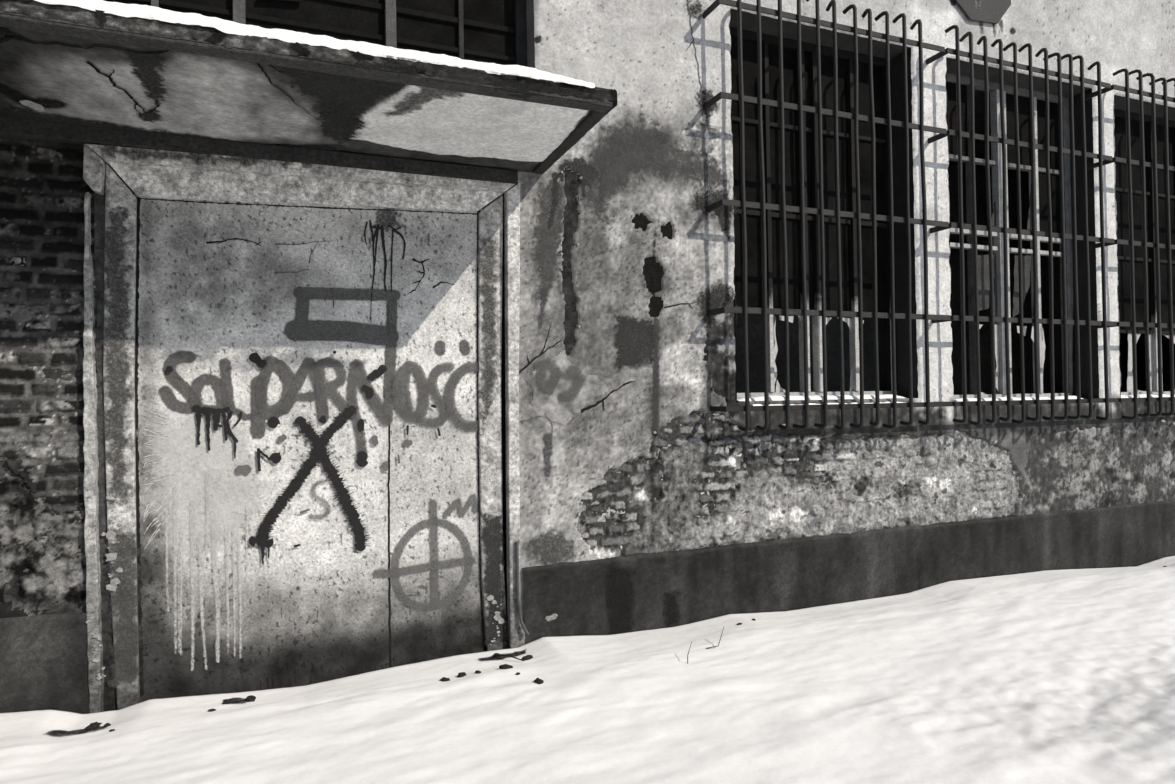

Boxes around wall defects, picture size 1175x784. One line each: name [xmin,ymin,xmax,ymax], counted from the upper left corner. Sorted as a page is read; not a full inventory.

crack [0,10,169,117]
crack [229,52,318,119]
leakage [251,58,601,151]
crack [686,0,704,105]
leakage [532,113,731,328]
flaking render [0,137,106,680]
leakage [543,433,553,476]
spalling [576,301,1175,558]
peeling [101,481,123,591]